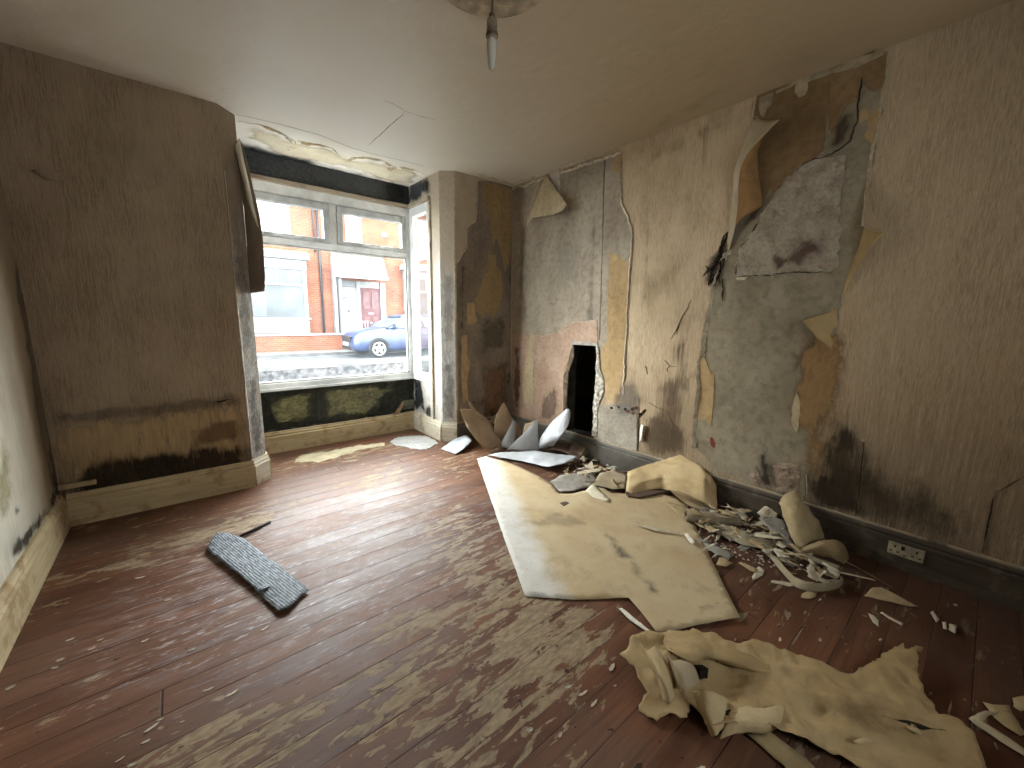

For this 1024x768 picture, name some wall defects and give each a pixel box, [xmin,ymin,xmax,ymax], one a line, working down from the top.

crack [236,101,434,166]
spalling [735,155,846,280]
leakage [703,232,728,301]
leakage [13,268,243,555]
leakage [260,379,431,433]
flaking render [512,320,636,451]
leakage [760,454,770,485]
leakage [806,429,948,523]